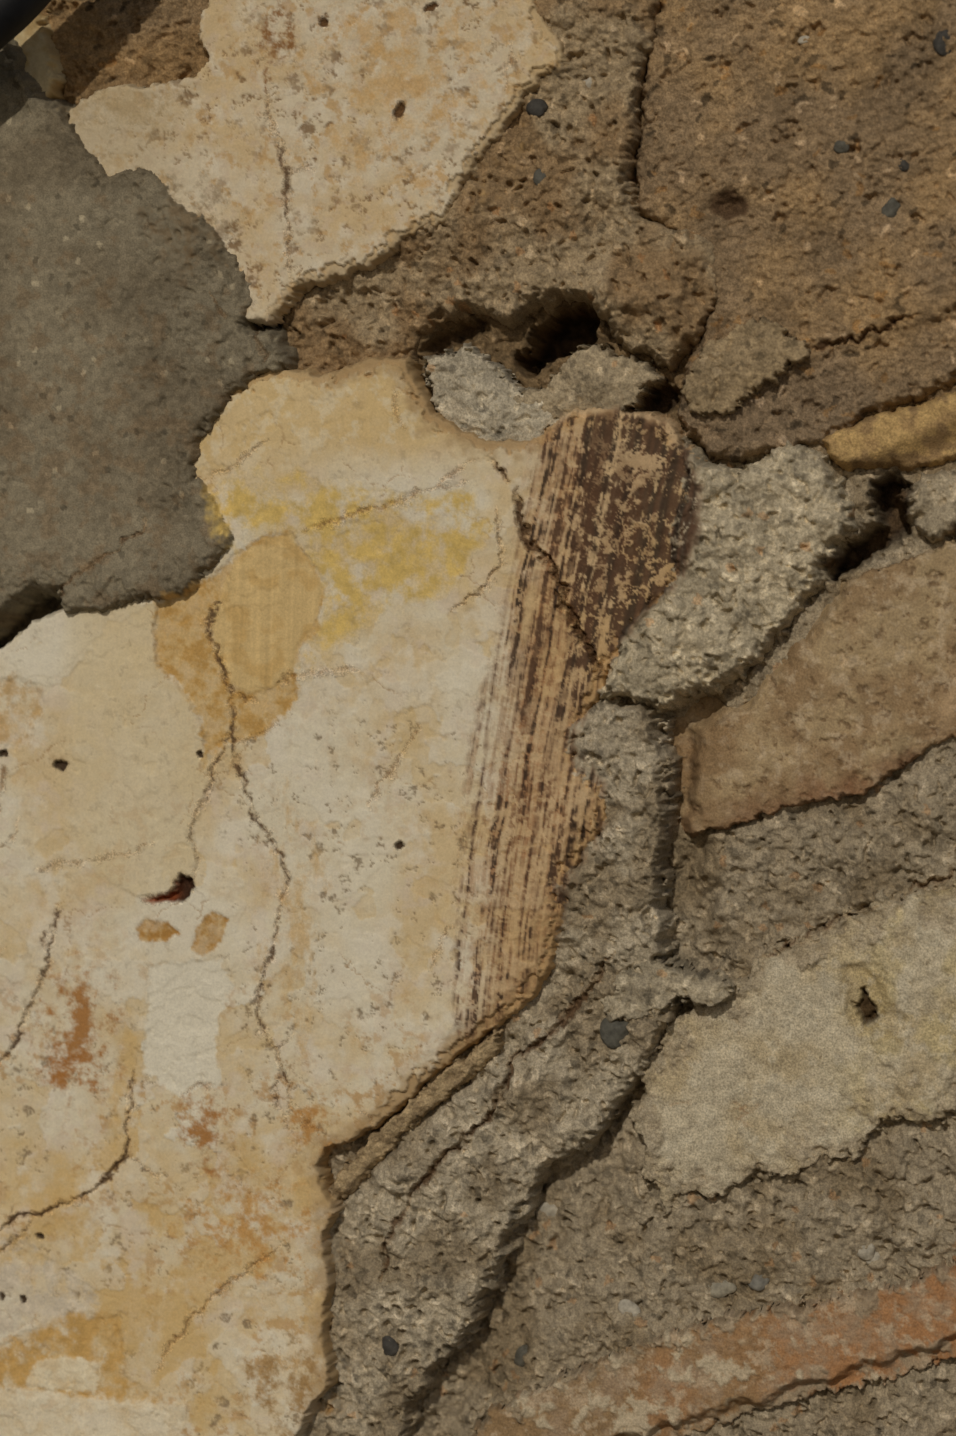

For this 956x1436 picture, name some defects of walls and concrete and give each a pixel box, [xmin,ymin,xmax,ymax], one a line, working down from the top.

hole [420,318,490,361]
hole [515,303,600,378]
hole [630,376,682,417]
peeling [147,525,331,778]
crack [301,458,611,677]
spalling [52,759,69,773]
crack [366,723,422,811]
crack [0,601,364,1140]
crack [0,1069,217,1253]
spalling [328,1026,505,1201]
crack [378,950,616,1283]
crack [151,1242,290,1373]